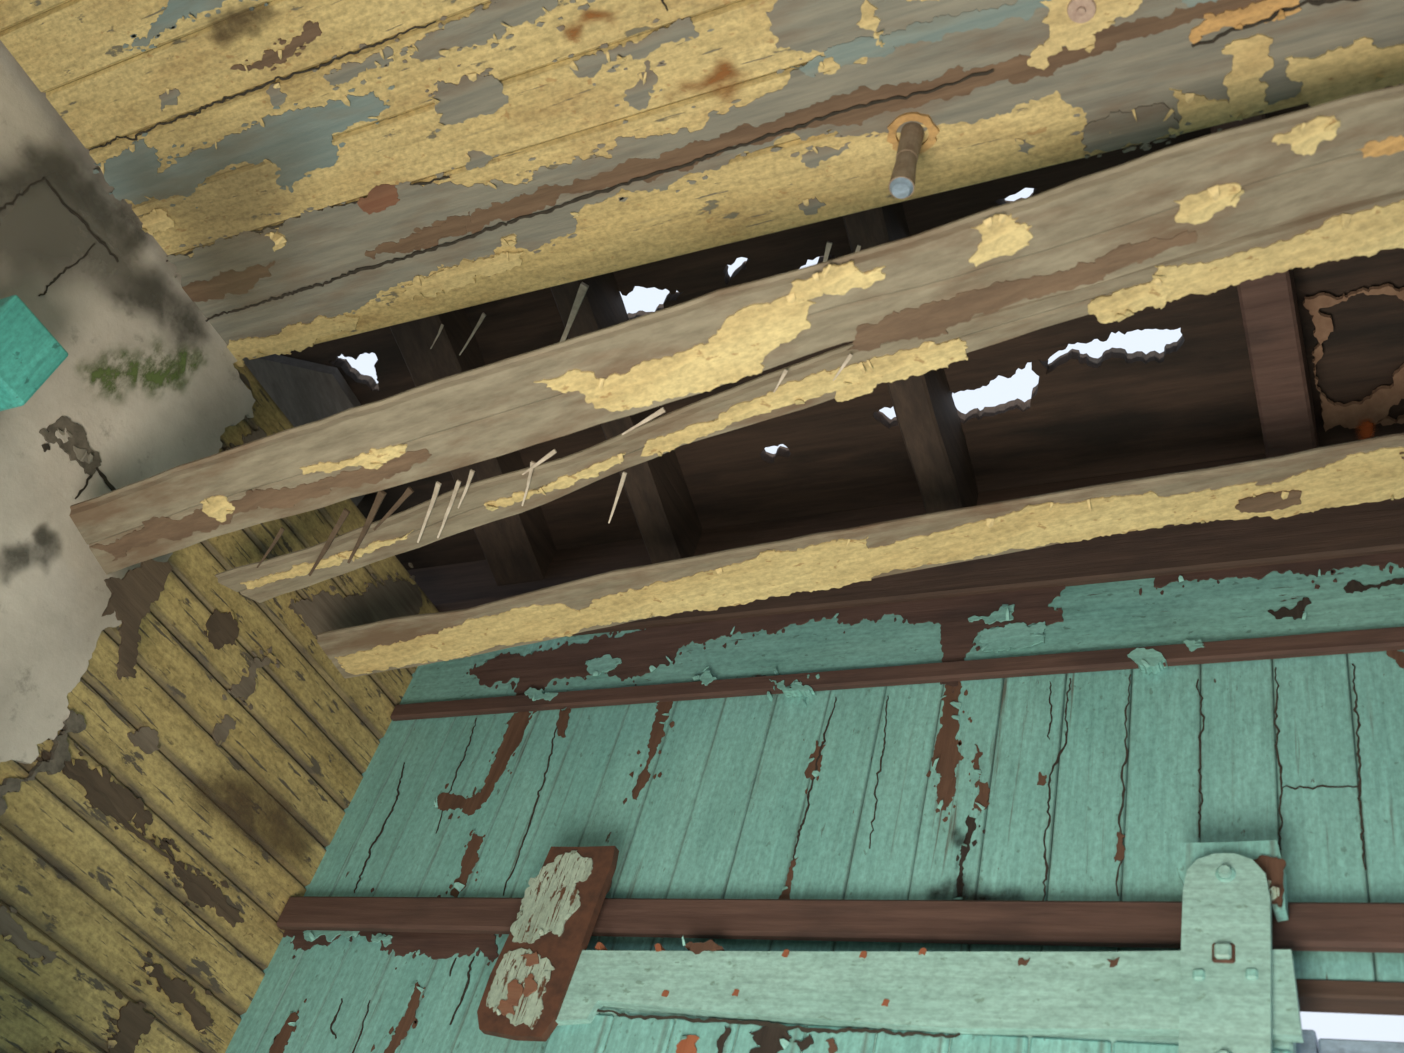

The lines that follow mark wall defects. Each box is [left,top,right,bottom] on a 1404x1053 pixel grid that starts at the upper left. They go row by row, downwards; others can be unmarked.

peeling [93,0,1404,367]
damp [0,150,202,375]
spalling [39,416,102,475]
damp [5,527,58,570]
peeling [288,563,423,639]
peeling [1235,490,1302,513]
peeling [1139,552,1404,620]
peeling [434,586,1066,900]
peeling [0,710,245,928]
peeling [283,850,593,1029]
peeling [106,951,214,1053]
peeling [749,1026,838,1053]